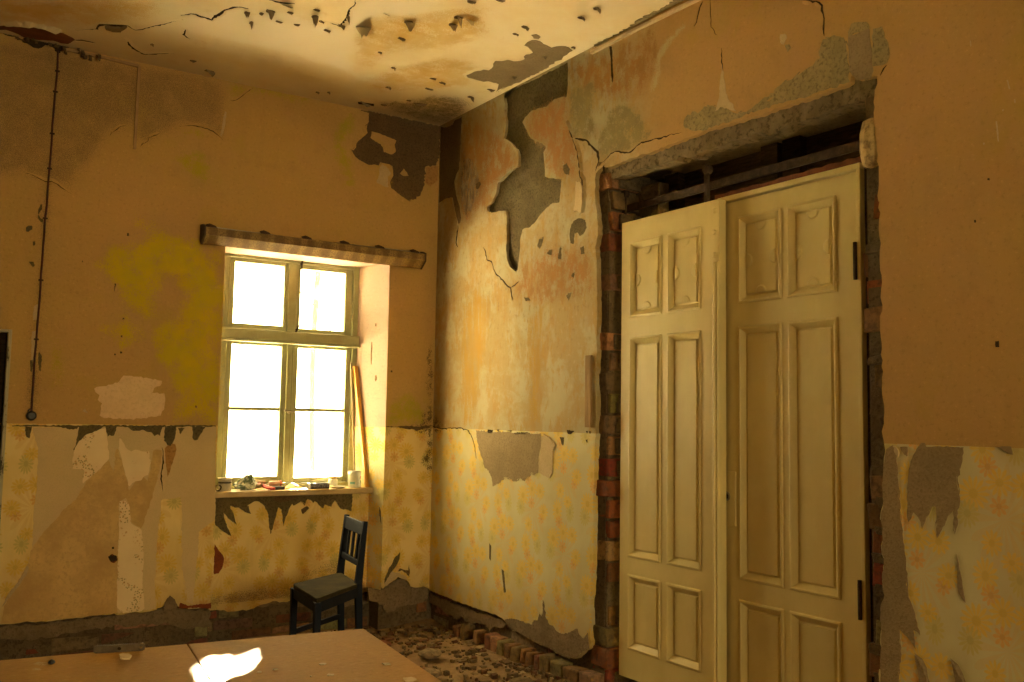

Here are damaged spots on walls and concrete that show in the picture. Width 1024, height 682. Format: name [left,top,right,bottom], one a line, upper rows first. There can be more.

crack [71,0,295,55]
crack [321,0,356,25]
spalling [594,0,684,47]
peeling [680,32,852,131]
peeling [349,101,463,226]
spalling [463,25,588,274]
crack [566,120,682,213]
leakage [0,38,311,427]
crack [484,249,519,301]
flaking render [0,444,604,682]